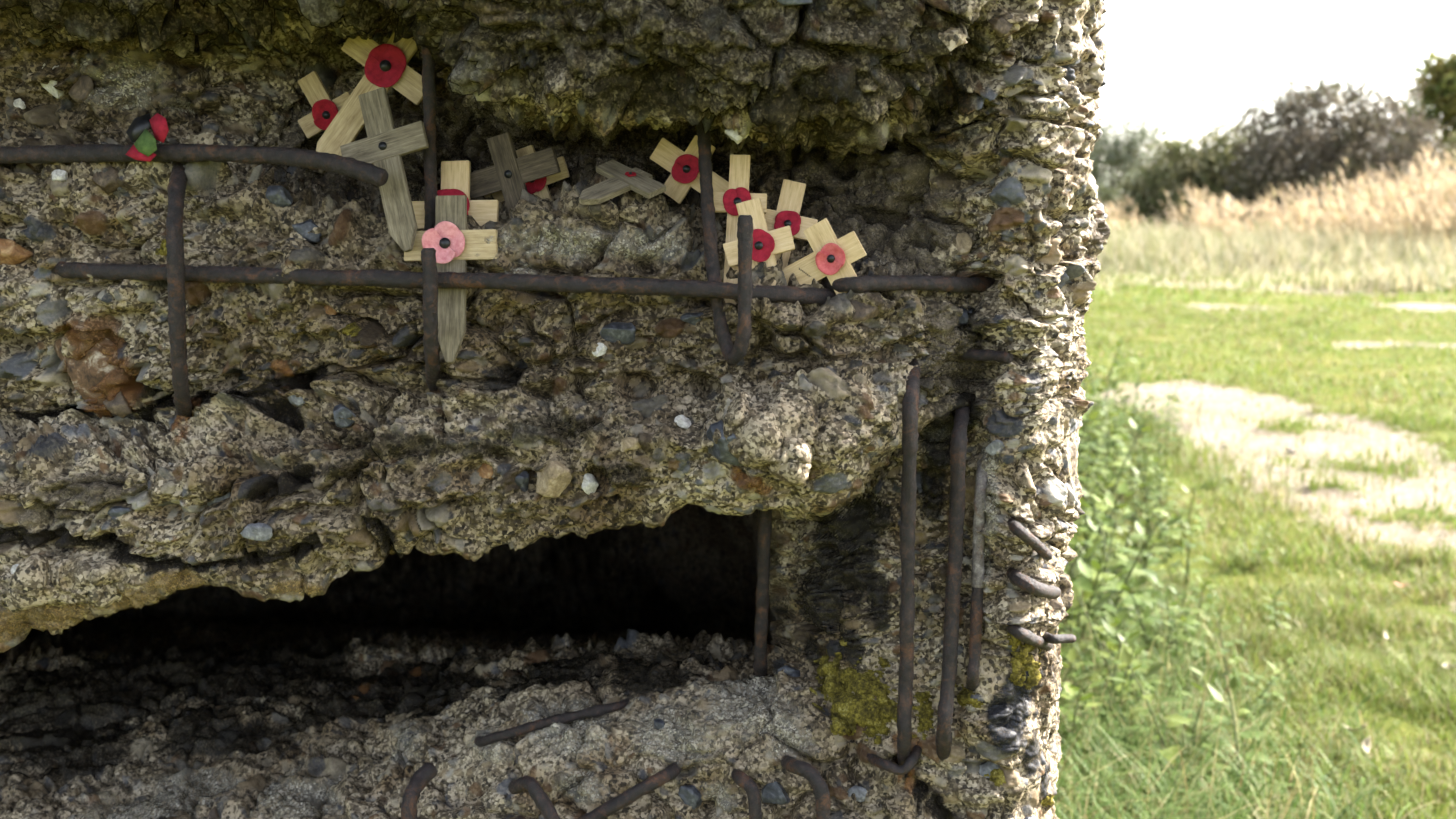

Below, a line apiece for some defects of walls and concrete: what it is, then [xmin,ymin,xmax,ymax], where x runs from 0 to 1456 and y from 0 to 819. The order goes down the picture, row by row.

rust [0,46,995,442]
spalling [17,470,151,525]
rust [1008,518,1053,561]
rust [867,358,988,795]
rust [1006,567,1061,599]
rust [1006,625,1076,651]
rust [474,698,630,747]
rust [401,762,437,819]
rust [508,776,560,819]
rust [578,762,682,819]
rust [731,769,762,819]
rust [781,755,831,819]